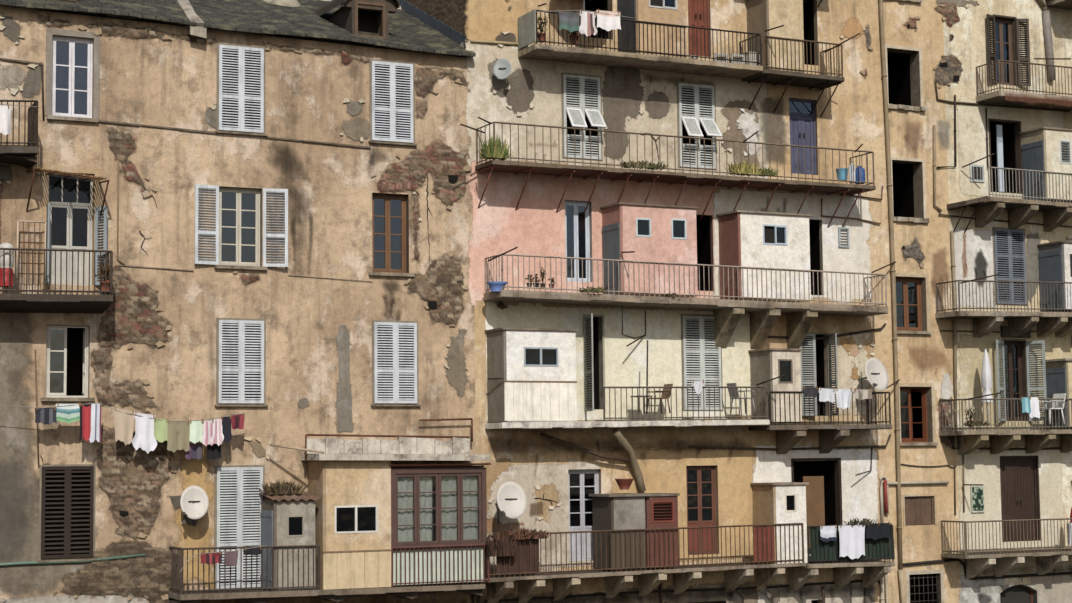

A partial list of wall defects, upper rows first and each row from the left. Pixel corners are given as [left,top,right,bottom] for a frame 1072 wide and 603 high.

spalling [904,16,920,29]
spalling [935,0,980,41]
peeling [0,62,42,98]
spalling [934,54,963,88]
spalling [107,127,157,198]
spalling [372,139,472,397]
spalling [902,236,925,268]
spalling [90,265,172,414]
spalling [56,428,198,603]